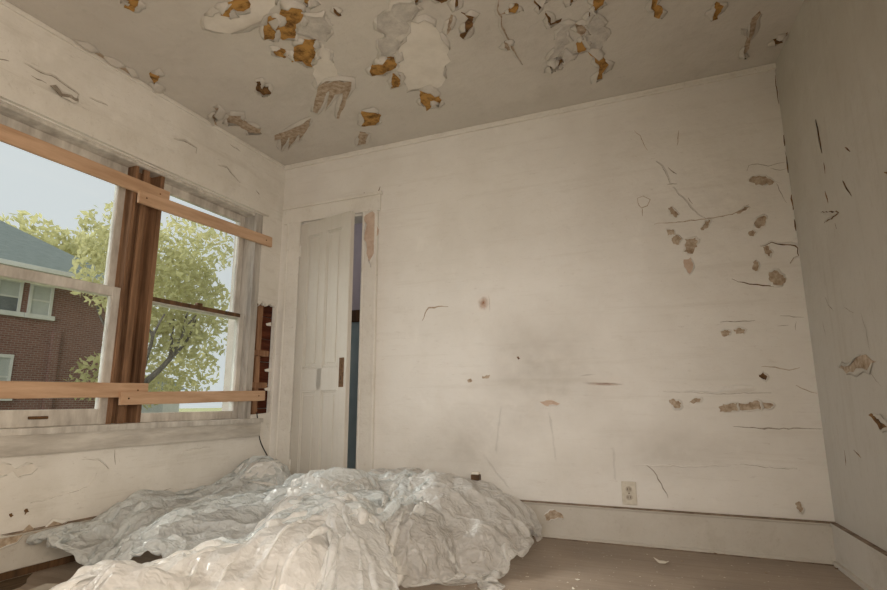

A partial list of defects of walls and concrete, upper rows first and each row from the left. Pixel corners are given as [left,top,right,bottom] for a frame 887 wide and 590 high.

peeling [75,40,166,94]
peeling [200,0,356,152]
peeling [365,0,480,111]
peeling [504,0,615,84]
peeling [355,107,382,146]
spalling [748,214,768,237]
spalling [666,219,712,275]
spalling [752,246,787,288]
spalling [669,396,703,410]
spalling [719,399,776,413]
peeling [869,413,887,433]
peeling [0,573,32,590]